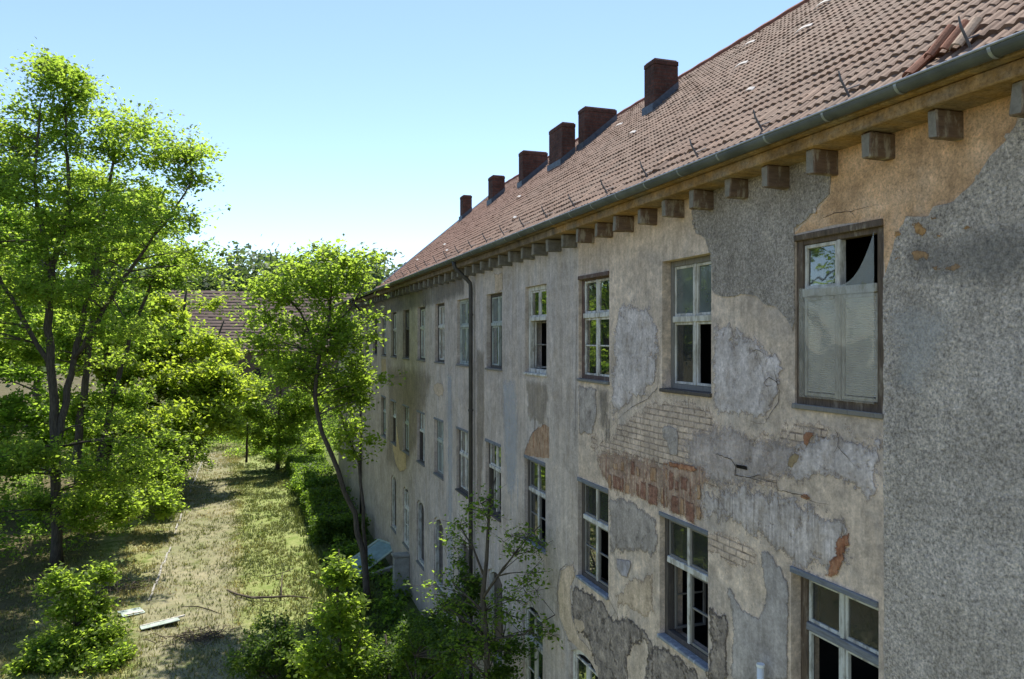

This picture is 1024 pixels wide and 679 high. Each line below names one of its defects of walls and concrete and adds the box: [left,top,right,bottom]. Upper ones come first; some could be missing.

flaking render [795,96,1017,273]
peeling [524,424,549,458]
peeling [590,299,882,577]
crack [718,454,822,504]
flaking render [556,561,728,679]